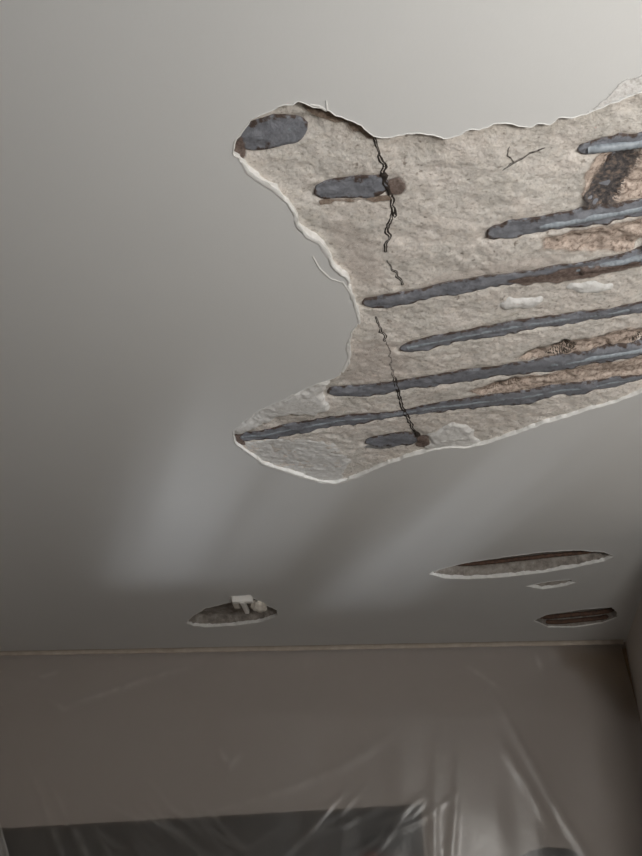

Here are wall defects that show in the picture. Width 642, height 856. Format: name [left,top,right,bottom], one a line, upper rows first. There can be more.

crack [373,137,404,285]
spalling [232,76,642,485]
crack [375,317,421,441]
spalling [185,595,278,627]
spalling [429,550,614,589]
spalling [534,607,618,628]